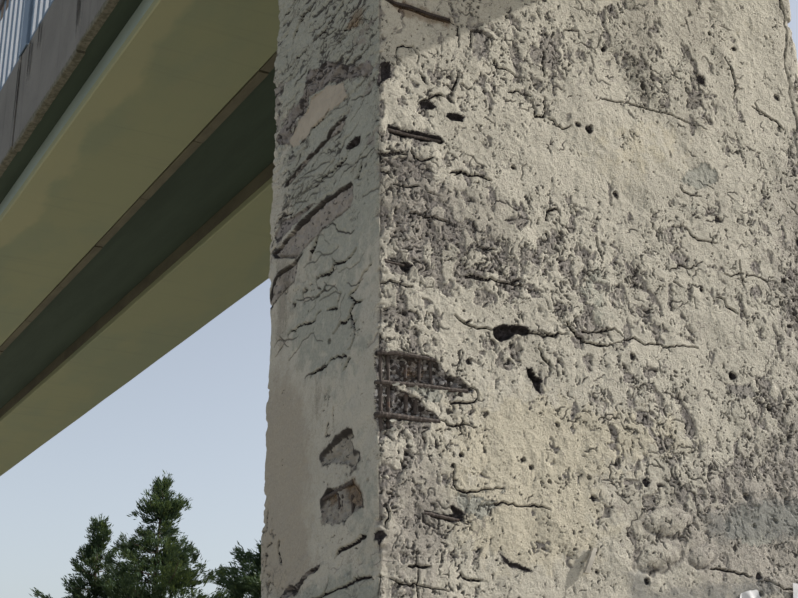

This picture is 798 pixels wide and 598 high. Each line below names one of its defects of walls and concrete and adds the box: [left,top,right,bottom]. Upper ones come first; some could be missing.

spalling [276,60,391,147]
crack [449,21,569,130]
spalling [284,117,347,187]
spalling [346,136,361,150]
crack [449,171,490,181]
crack [291,251,362,374]
crack [464,274,521,287]
spalling [493,324,530,342]
crack [527,322,697,366]
spalling [373,348,474,432]
spalling [318,428,363,526]
crack [321,551,448,598]